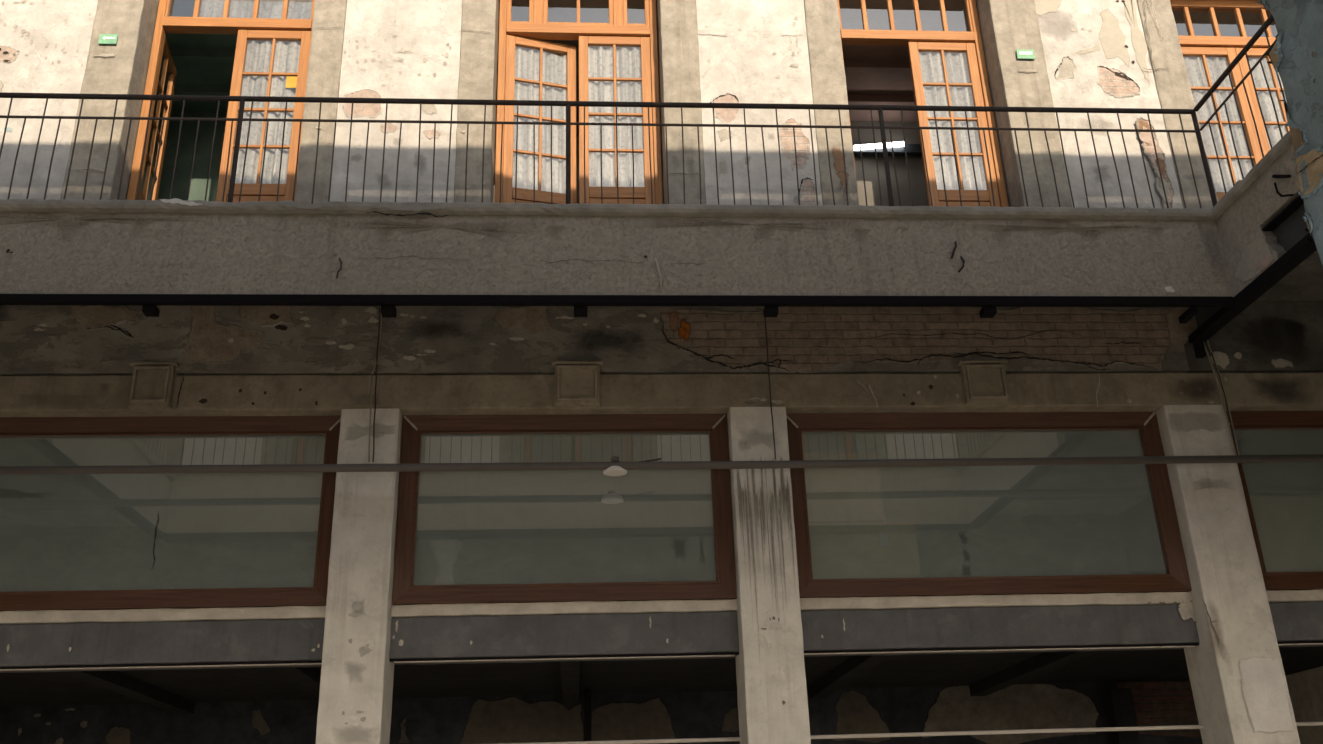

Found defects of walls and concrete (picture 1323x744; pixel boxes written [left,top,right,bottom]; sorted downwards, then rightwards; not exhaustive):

peeling [0,0,83,66]
peeling [342,20,405,133]
peeling [1055,56,1077,80]
peeling [1097,45,1141,98]
peeling [1263,30,1283,74]
peeling [777,117,812,171]
peeling [1135,117,1174,208]
peeling [1279,100,1323,242]
peeling [1235,236,1274,282]
crack [661,318,792,372]
crack [853,330,1156,408]
water stain [737,460,793,585]